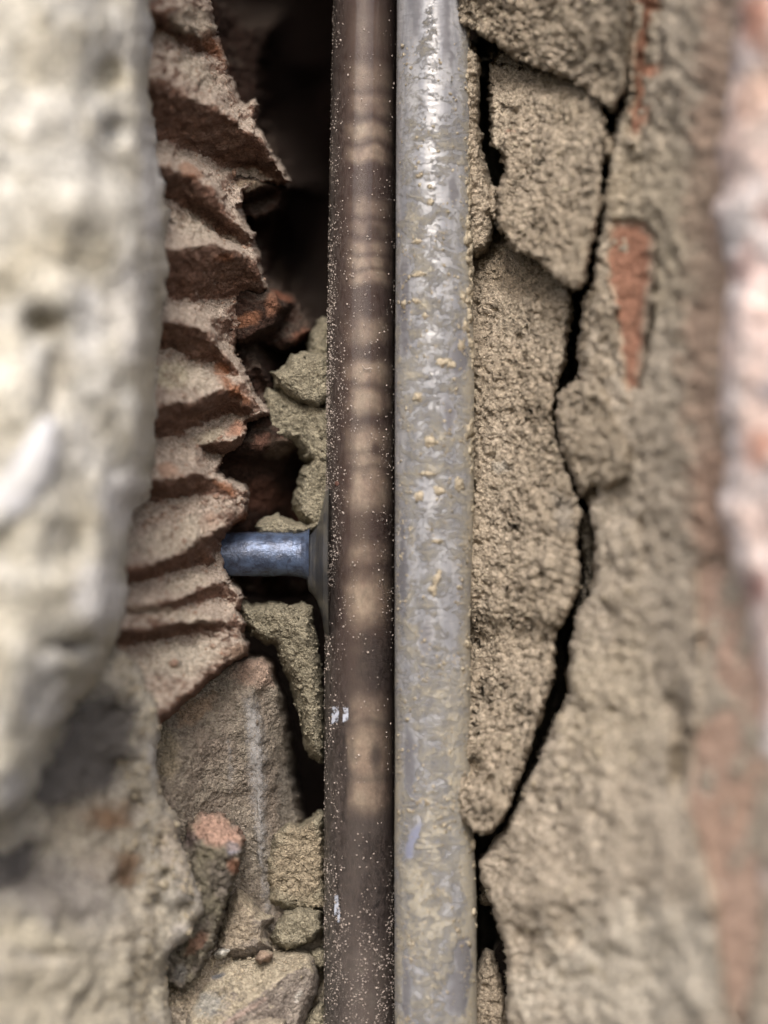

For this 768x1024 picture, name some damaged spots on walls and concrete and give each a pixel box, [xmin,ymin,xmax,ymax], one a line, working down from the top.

crack [471,35,556,187]
crack [553,101,621,421]
crack [569,475,587,509]
crack [474,543,584,965]